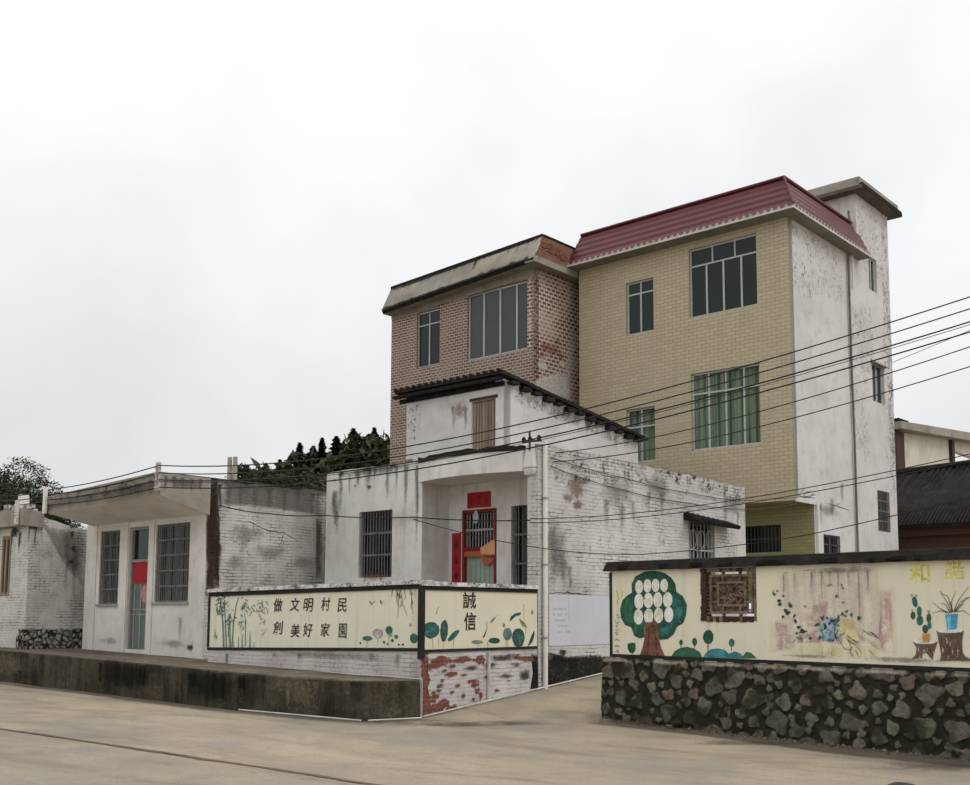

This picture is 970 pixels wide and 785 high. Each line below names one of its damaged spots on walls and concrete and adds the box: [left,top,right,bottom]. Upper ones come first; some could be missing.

leakage [332,459,418,518]
leakage [165,476,322,595]
peeling [421,653,487,716]